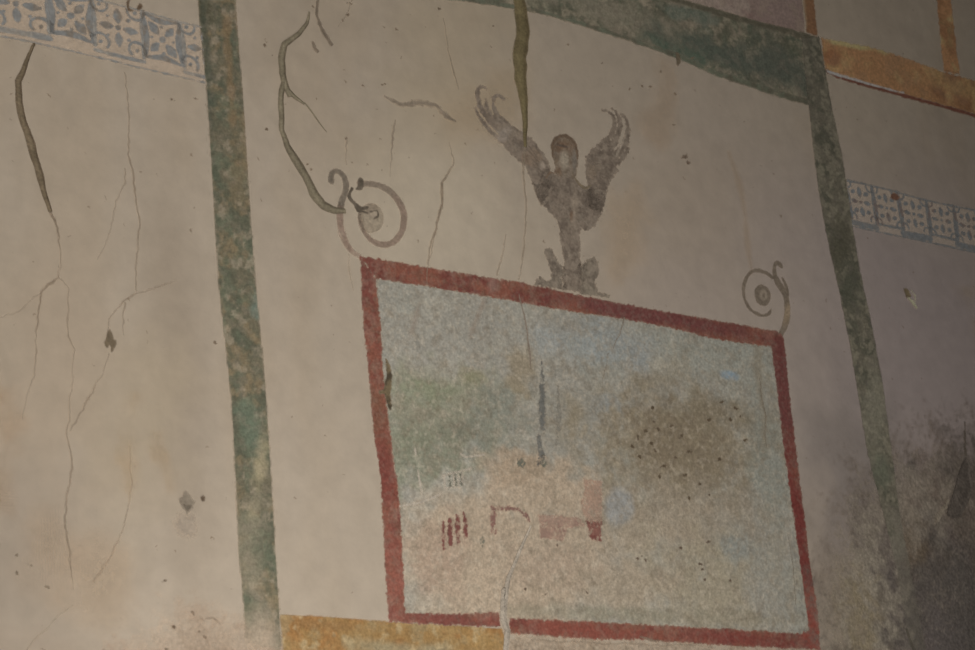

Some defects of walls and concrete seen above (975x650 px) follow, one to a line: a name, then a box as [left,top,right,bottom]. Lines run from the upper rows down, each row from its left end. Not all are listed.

crack [15,43,59,242]
crack [278,0,346,214]
crack [385,96,456,122]
crack [429,171,450,251]
crack [513,0,530,236]
crack [500,526,532,650]